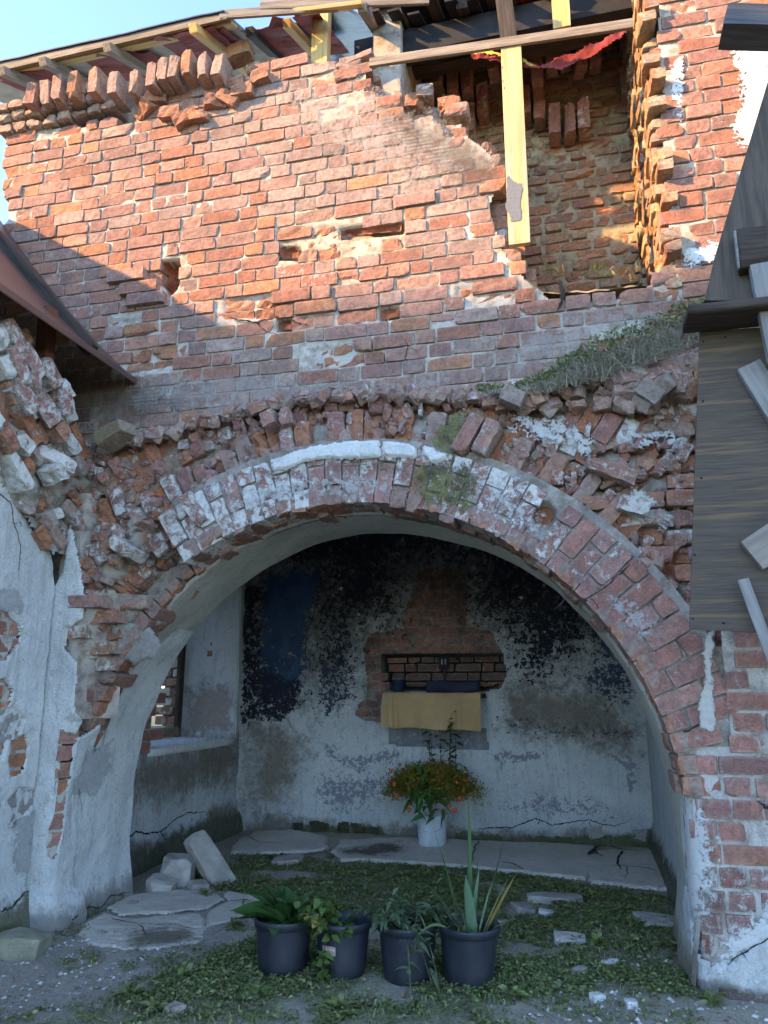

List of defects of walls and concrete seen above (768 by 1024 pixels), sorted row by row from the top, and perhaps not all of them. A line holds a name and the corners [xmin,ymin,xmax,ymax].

water stain [730,51,768,148]
spalling [0,318,697,671]
peeling [240,533,635,730]
flaking render [0,679,36,829]
flaking render [43,727,88,859]
crack [130,811,207,839]
peeling [485,709,641,795]
crack [472,817,661,877]
water stain [506,682,632,749]
crack [728,938,768,965]